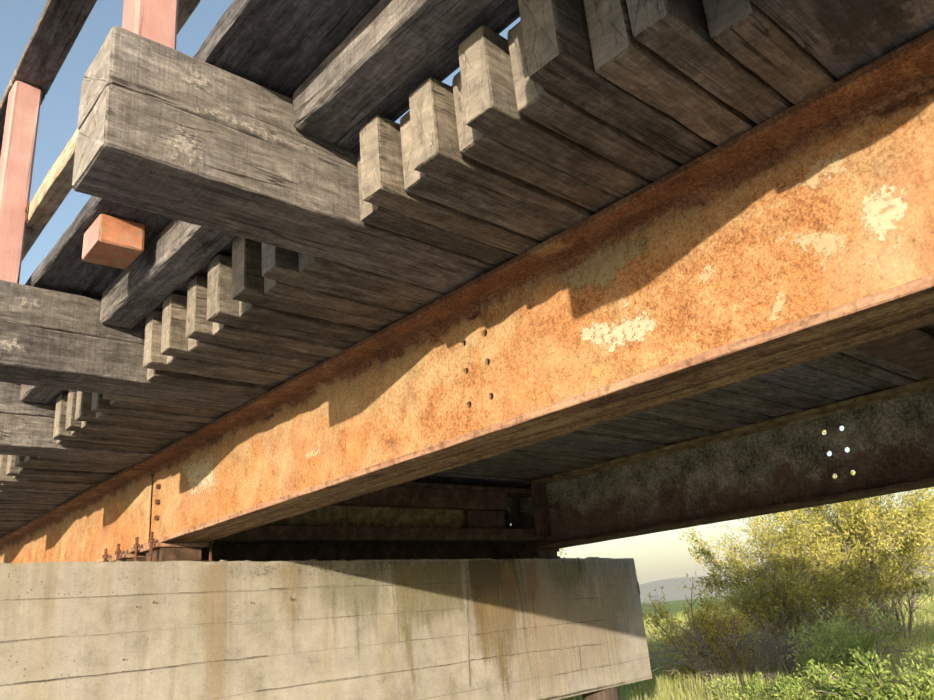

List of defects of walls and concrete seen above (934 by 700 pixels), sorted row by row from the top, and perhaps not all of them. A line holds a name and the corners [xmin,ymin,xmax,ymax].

corrosion [879,87,934,117]
peeling [796,148,852,189]
peeling [860,184,908,249]
peeling [562,236,647,291]
peeling [775,225,851,271]
peeling [581,297,655,380]